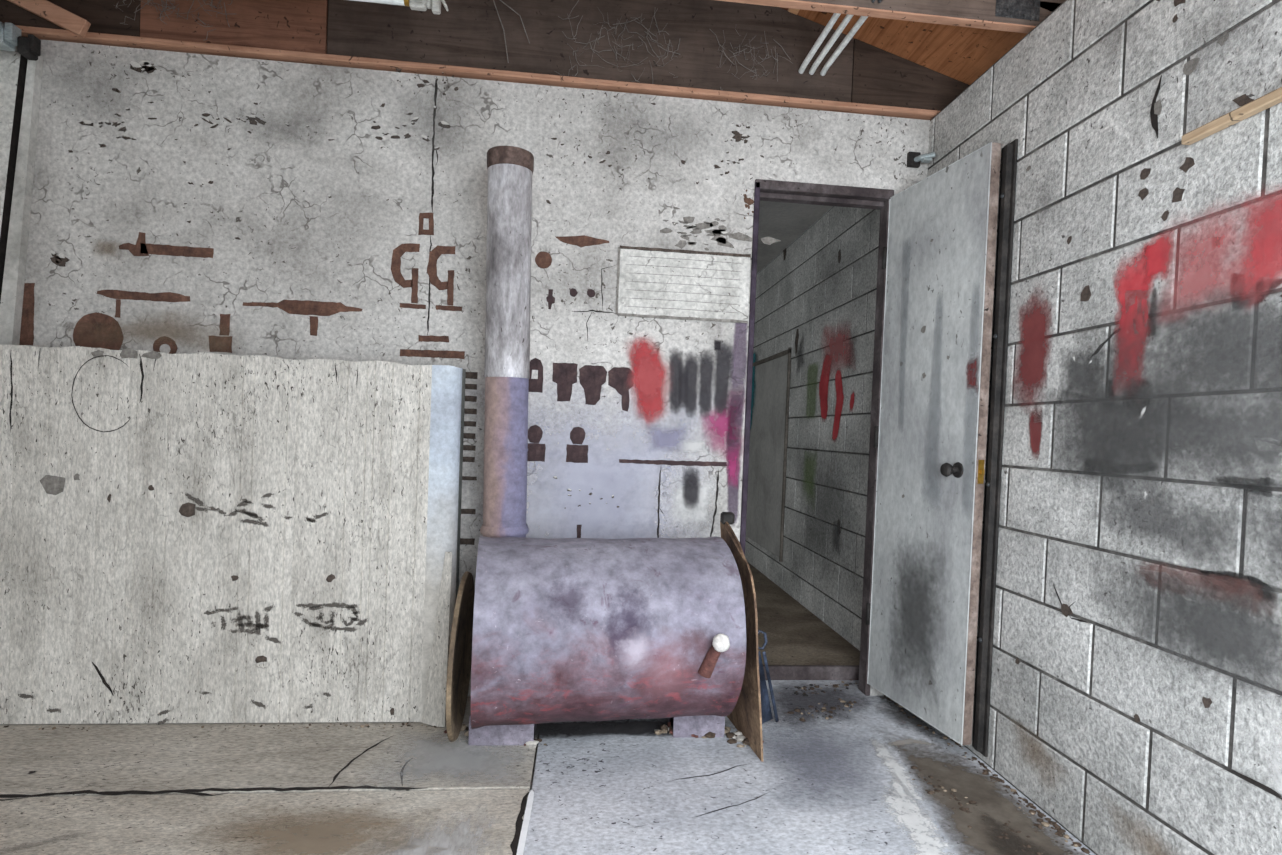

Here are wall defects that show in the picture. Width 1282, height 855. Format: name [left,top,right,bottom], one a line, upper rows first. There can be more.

crack [0,735,424,801]
water stain [870,739,948,855]